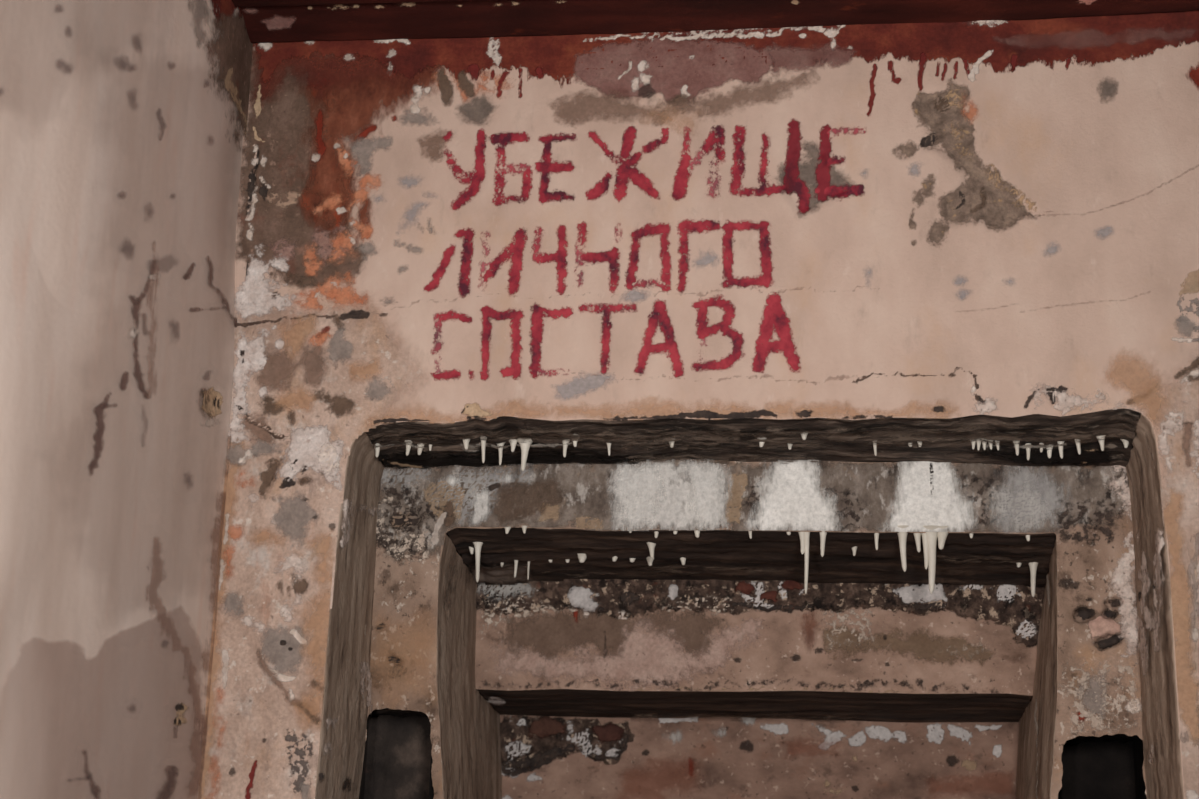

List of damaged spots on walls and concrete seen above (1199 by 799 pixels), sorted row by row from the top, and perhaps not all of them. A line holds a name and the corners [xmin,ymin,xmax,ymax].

corrosion [1189,65,1199,89]
peeling [189,0,1199,246]
crack [89,85,387,474]
crack [853,367,984,405]
efflorescence [608,459,727,530]
efflorescence [748,460,837,531]
efflorescence [890,461,974,532]
flaking render [198,308,448,799]
flaking render [1075,366,1199,799]
spalling [444,555,1045,693]
crack [84,751,101,799]
crack [158,766,178,799]